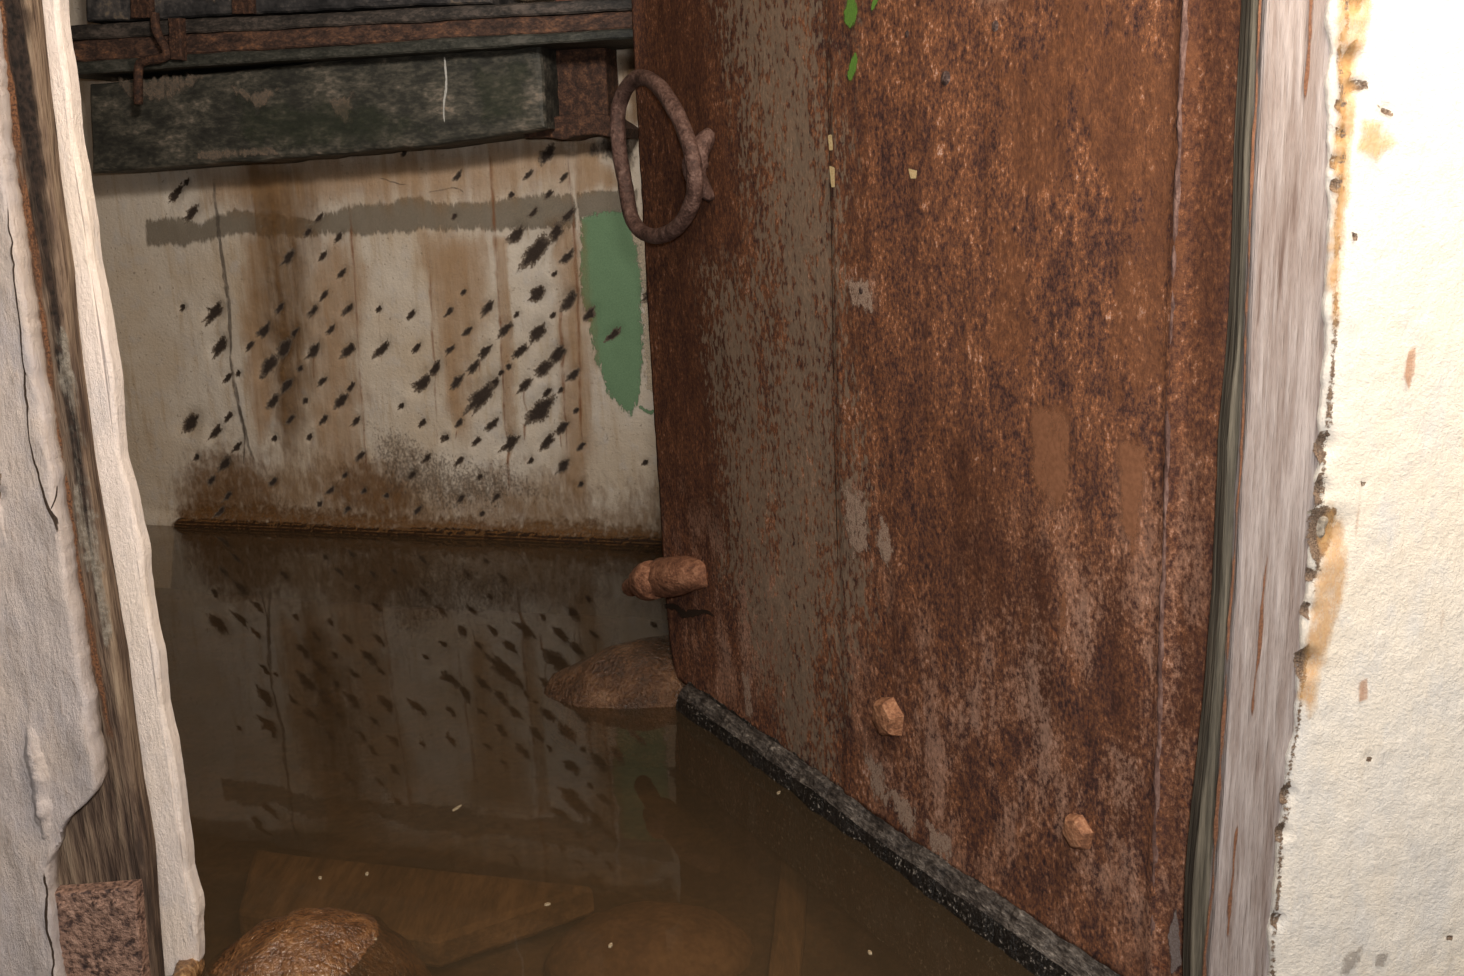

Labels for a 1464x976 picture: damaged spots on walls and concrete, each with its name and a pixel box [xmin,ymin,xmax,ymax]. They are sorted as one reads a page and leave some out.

mould [590,138,631,165]
spalling [1329,0,1368,259]
crack [7,210,59,532]
water stain [251,167,304,432]
water stain [171,457,668,620]
spalling [1299,281,1339,620]
spalling [1270,644,1311,976]